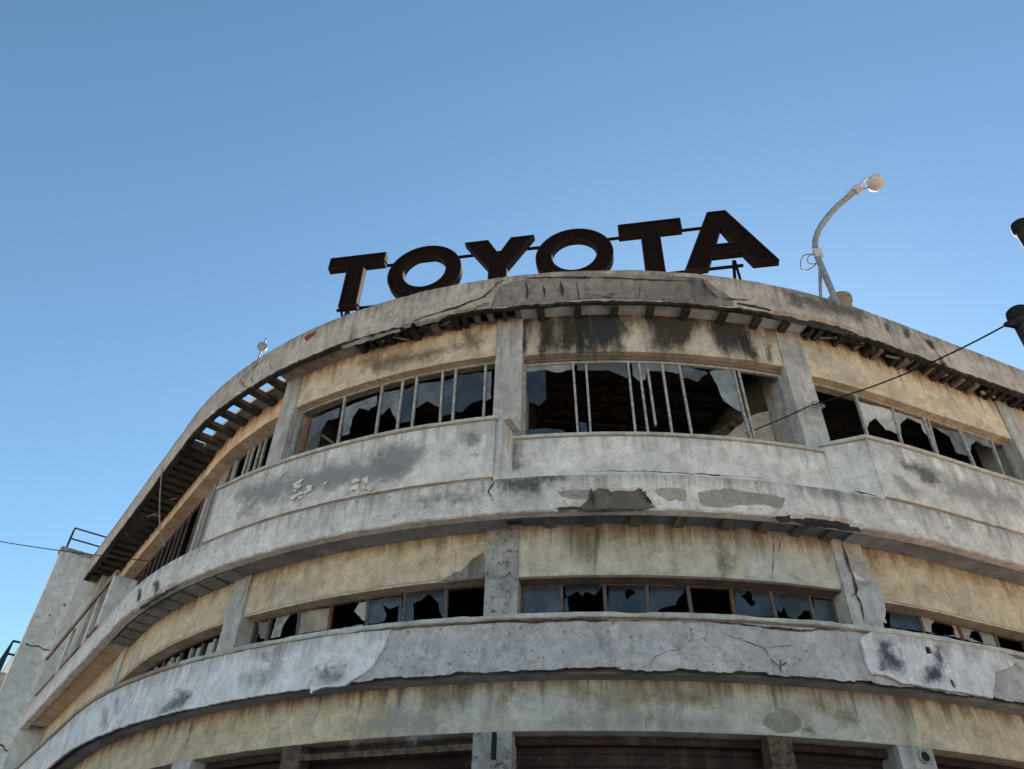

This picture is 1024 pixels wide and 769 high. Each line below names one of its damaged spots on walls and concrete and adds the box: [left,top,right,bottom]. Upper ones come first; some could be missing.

crack [410,276,748,322]
water stain [523,315,627,357]
water stain [646,315,771,359]
peeling [290,479,327,500]
peeling [349,477,372,494]
spalling [558,487,862,532]
spalling [439,553,485,583]
crack [437,538,865,671]
water stain [878,641,903,671]
water stain [927,646,943,679]
flaking render [859,632,1018,699]
flaking render [19,629,393,769]